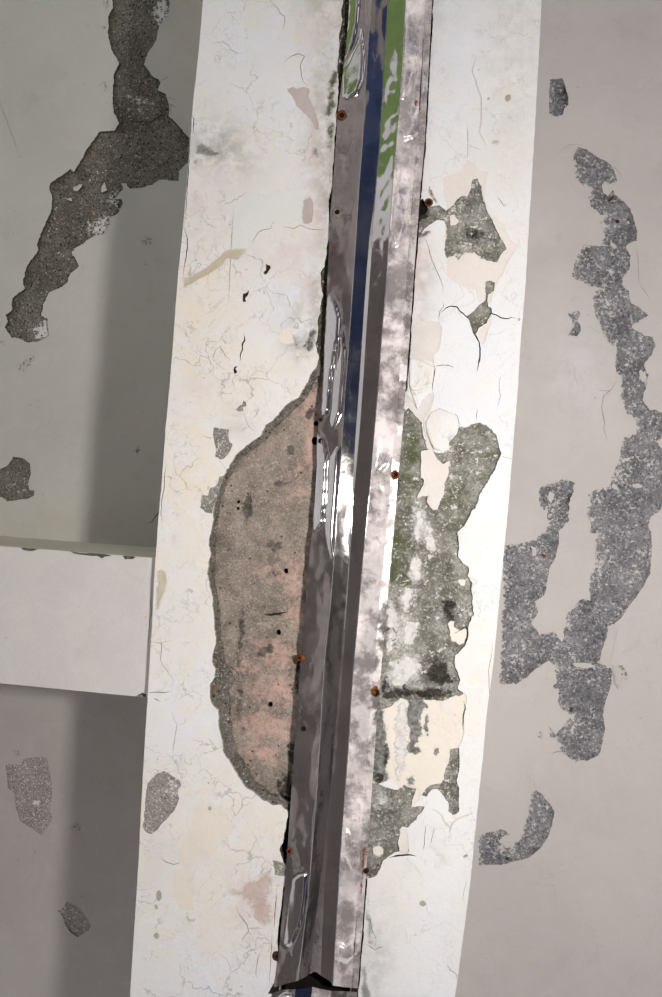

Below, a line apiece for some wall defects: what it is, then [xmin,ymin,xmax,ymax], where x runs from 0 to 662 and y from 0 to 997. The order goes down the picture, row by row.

spalling [5,0,191,343]
crack [183,118,194,270]
crack [228,220,318,300]
spalling [332,0,349,175]
spalling [418,160,519,370]
spalling [0,457,34,501]
crack [145,598,186,747]
spalling [200,241,329,876]
spalling [366,321,501,878]
spalling [499,144,662,763]
spalling [478,790,554,866]
crack [236,895,277,982]